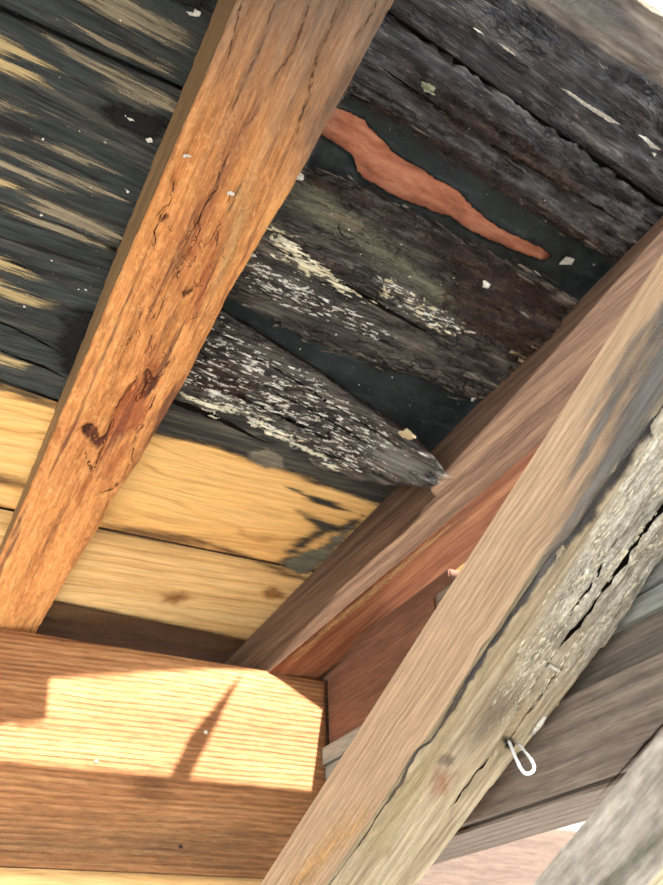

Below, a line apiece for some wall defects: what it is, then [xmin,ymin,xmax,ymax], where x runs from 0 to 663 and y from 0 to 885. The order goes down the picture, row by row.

peeling [246,226,475,342]
water stain [0,380,52,408]
water stain [154,398,398,506]
peeling [180,316,428,481]
water stain [110,526,207,547]
water stain [219,487,357,580]
crack [510,504,663,737]
crack [595,724,663,801]